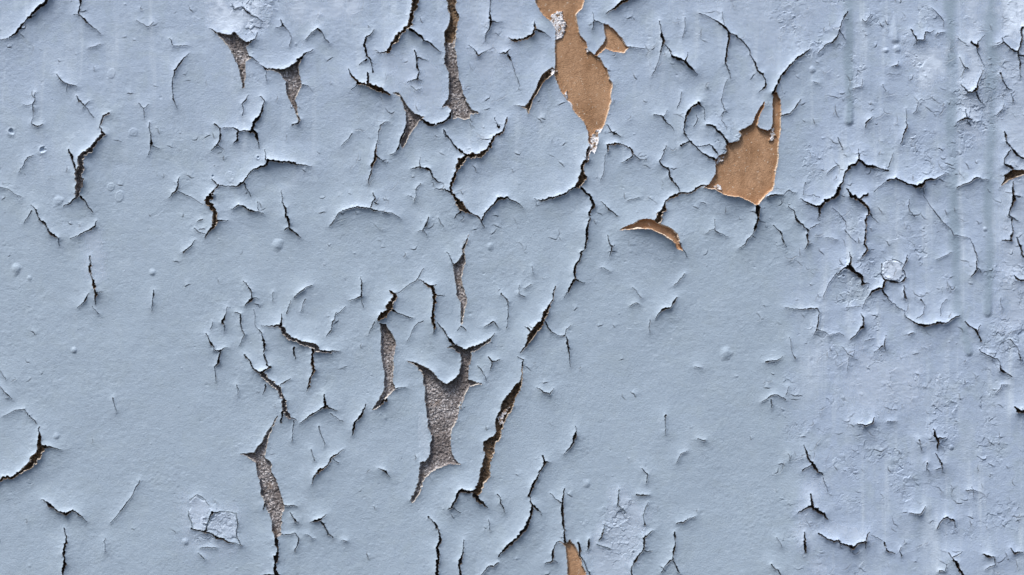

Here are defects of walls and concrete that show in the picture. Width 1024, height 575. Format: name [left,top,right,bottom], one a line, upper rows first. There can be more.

peeling [346,0,480,156]
peeling [513,0,644,163]
crack [168,95,312,253]
crack [326,0,871,381]
peeling [617,92,789,259]
crack [761,103,1024,420]
crack [0,371,140,575]
peeling [241,300,341,575]
peeling [407,235,495,503]
peeling [444,356,525,515]
crack [427,426,580,575]
crack [770,445,903,575]